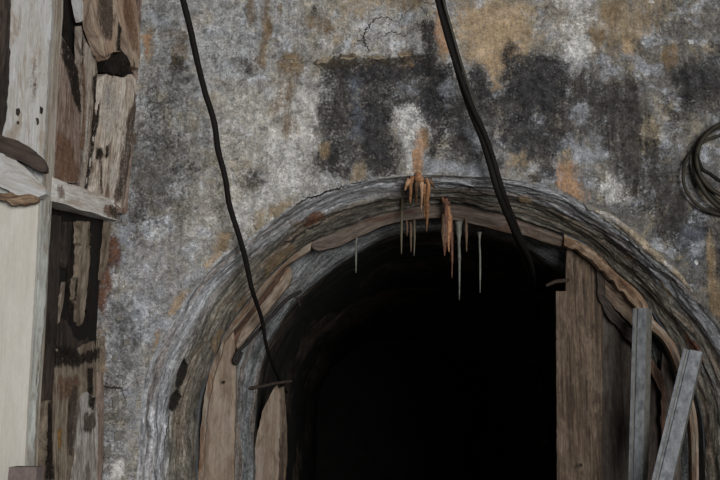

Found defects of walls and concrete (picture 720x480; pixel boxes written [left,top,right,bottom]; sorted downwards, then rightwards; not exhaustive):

crack [354,0,435,53]
corrosion [412,127,428,173]
damp [215,0,720,320]
corrosion [98,228,121,313]